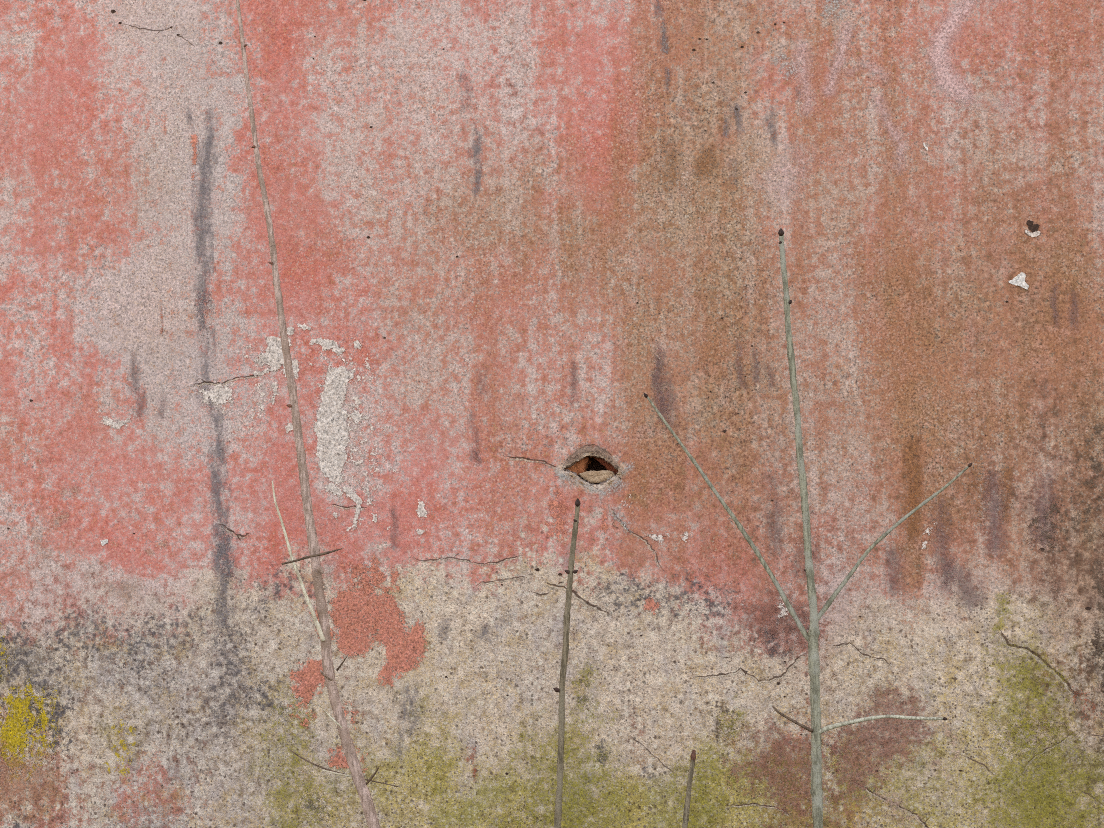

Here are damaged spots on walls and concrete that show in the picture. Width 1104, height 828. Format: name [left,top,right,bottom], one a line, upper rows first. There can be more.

water stain [191,116,291,744]
peeling [199,323,398,541]
spalling [556,451,633,529]
water stain [1026,417,1104,553]
peeling [649,531,688,543]
water stain [246,565,326,621]
water stain [1079,550,1104,682]
water stain [594,739,611,767]
water stain [700,699,743,745]